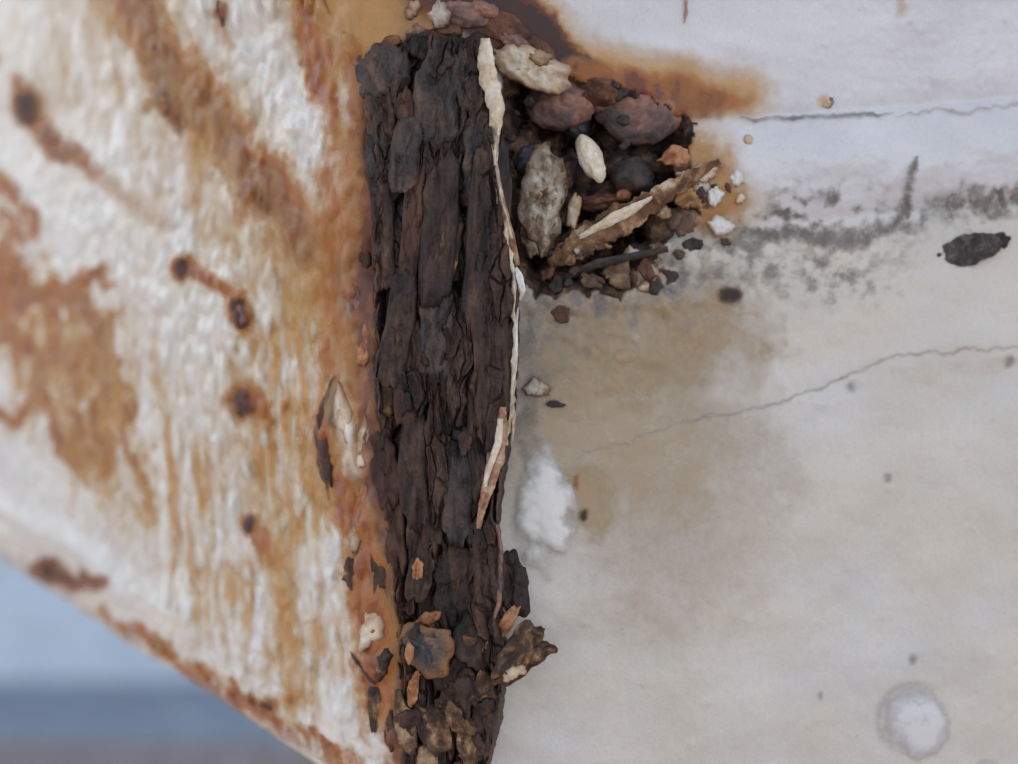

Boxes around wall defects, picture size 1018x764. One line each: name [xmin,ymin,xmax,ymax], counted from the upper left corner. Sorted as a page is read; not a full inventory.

crack [682,0,690,23]
spalling [380,0,747,529]
water stain [719,224,912,249]
water stain [932,185,1018,219]
corrosion [0,0,761,764]
water stain [514,273,770,532]
peeling [493,525,503,619]